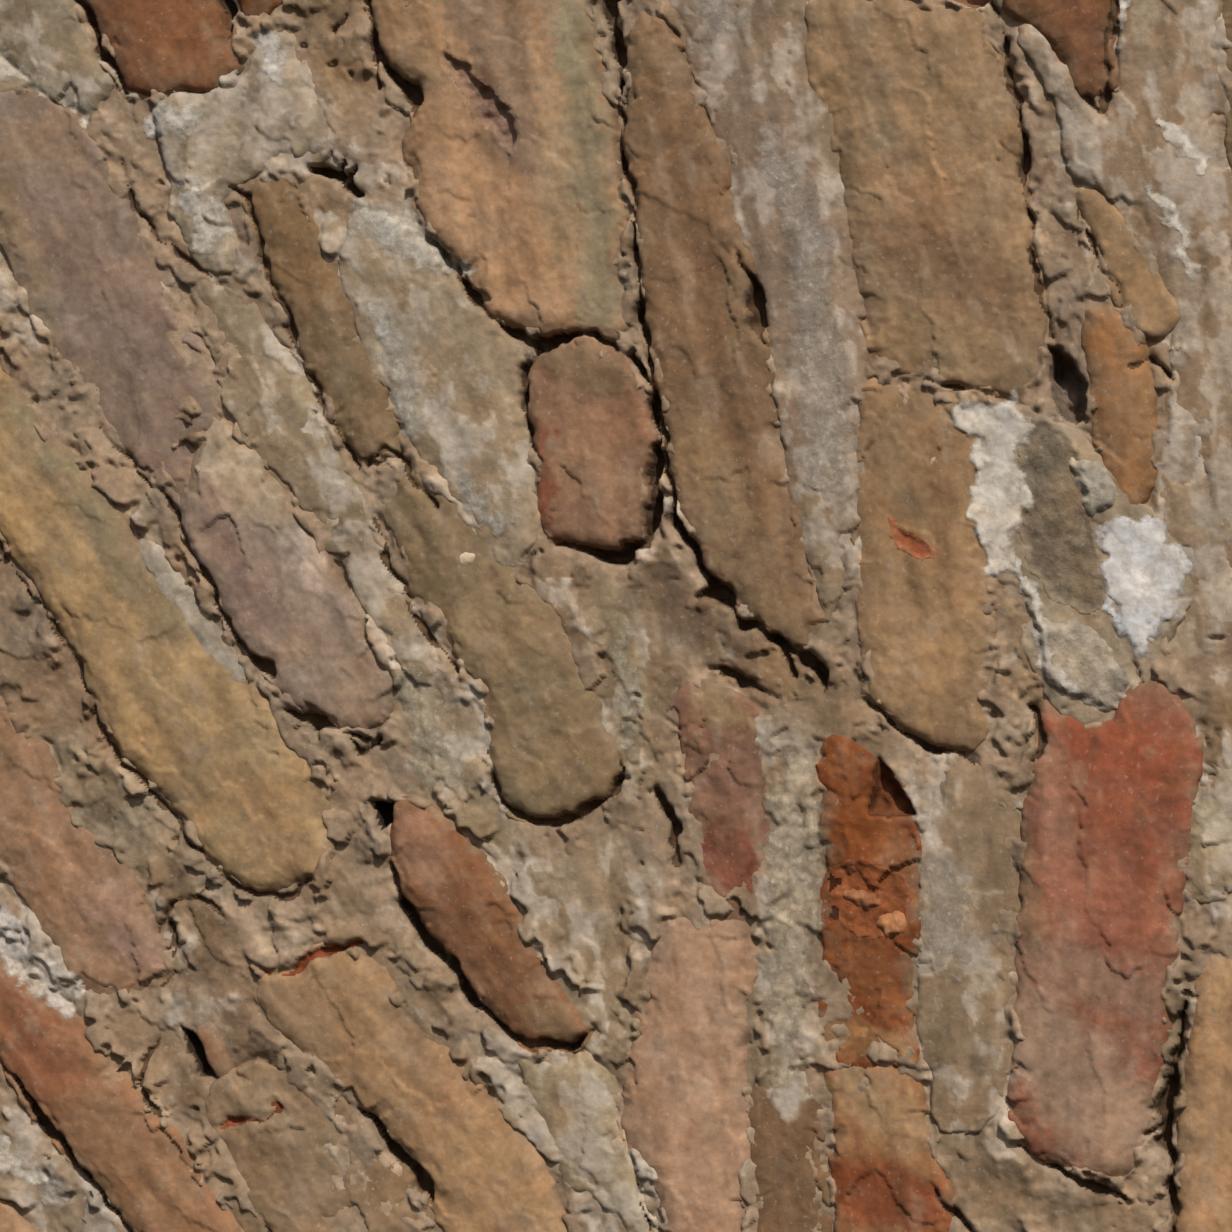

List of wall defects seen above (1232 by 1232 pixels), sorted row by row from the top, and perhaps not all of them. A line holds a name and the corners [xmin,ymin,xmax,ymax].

damp [951,389,1080,693]
damp [1096,515,1192,657]